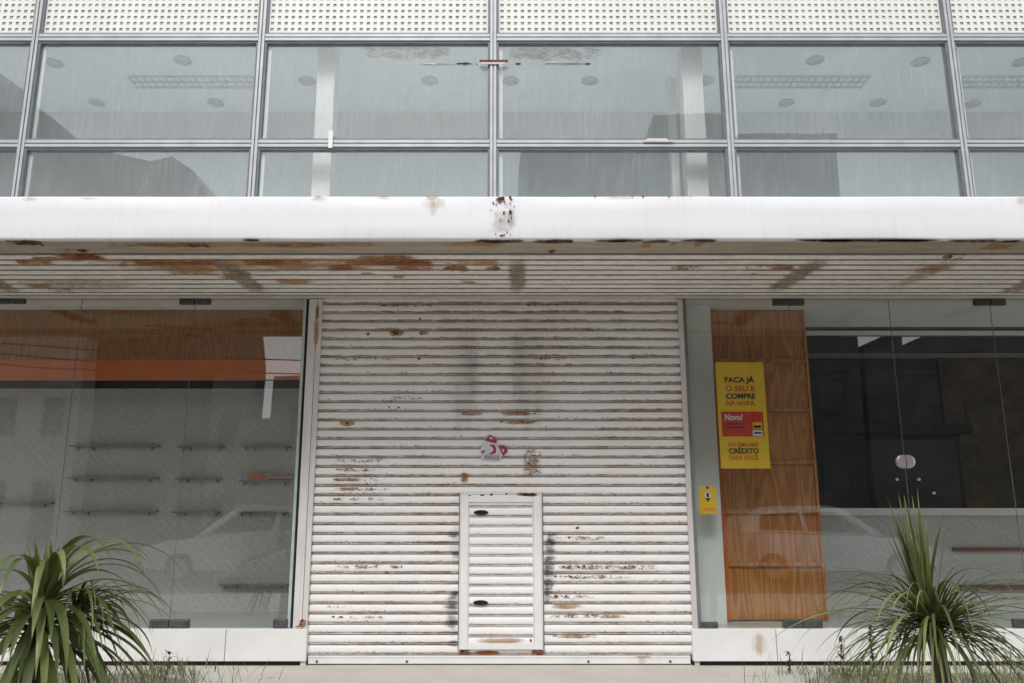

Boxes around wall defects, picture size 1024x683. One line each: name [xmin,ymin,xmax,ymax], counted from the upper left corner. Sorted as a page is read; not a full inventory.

rust [8,239,500,284]
rust [451,240,573,253]
rust [597,239,716,247]
rust [746,264,795,275]
rust [913,240,1020,271]
rust [554,564,654,579]
rust [552,595,619,619]
rust [460,638,544,656]